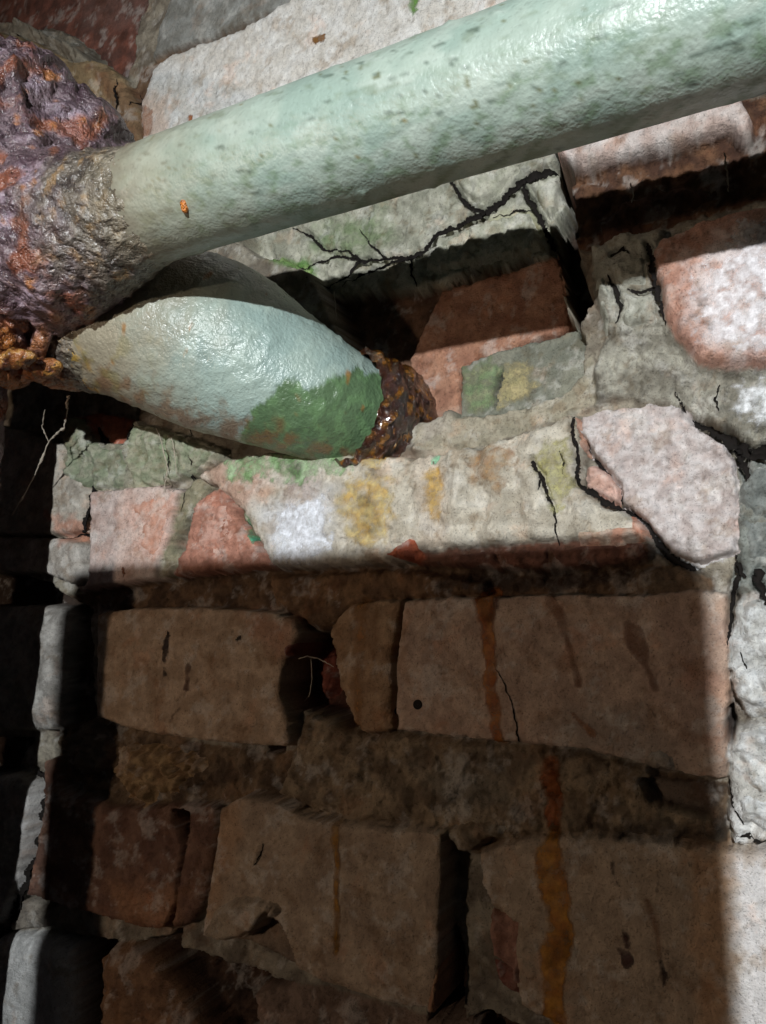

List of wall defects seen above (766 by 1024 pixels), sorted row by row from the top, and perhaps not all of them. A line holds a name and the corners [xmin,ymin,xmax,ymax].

crack [293,169,567,289]
crack [607,242,666,325]
crack [531,417,697,572]
crack [674,385,766,482]
rust [474,588,510,742]
rust [535,757,574,1024]